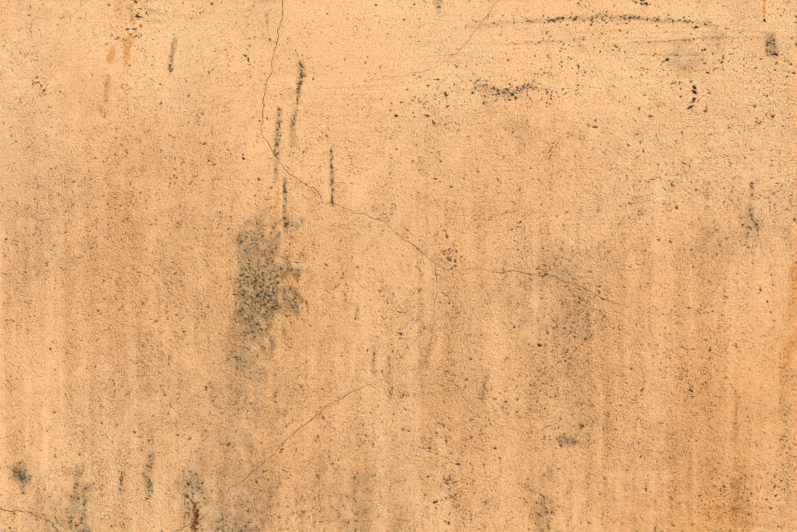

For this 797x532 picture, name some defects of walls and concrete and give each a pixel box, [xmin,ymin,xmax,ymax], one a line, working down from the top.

water stain [228,181,299,379]
crack [174,1,649,532]